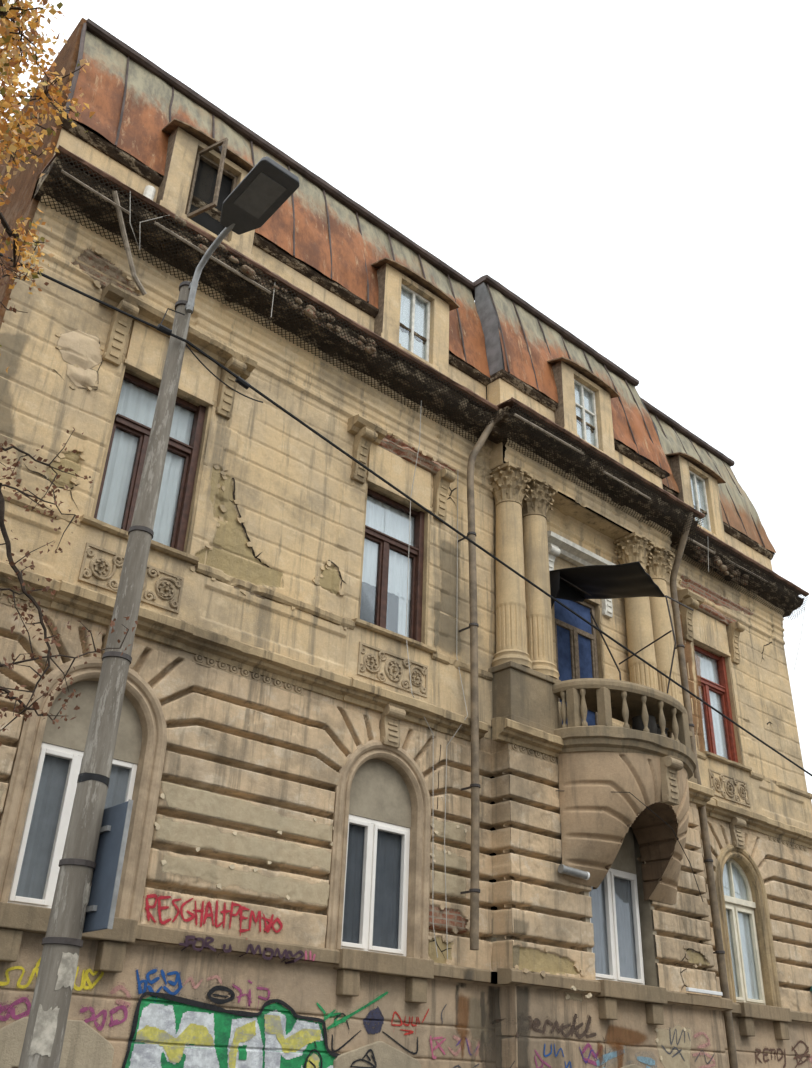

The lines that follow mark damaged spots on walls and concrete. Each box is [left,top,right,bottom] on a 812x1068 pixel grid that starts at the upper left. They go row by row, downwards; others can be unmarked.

spalling [42,447,85,490]
spalling [190,465,296,610]
spalling [312,561,345,596]
peeling [428,820,470,965]
spalling [512,946,592,1001]